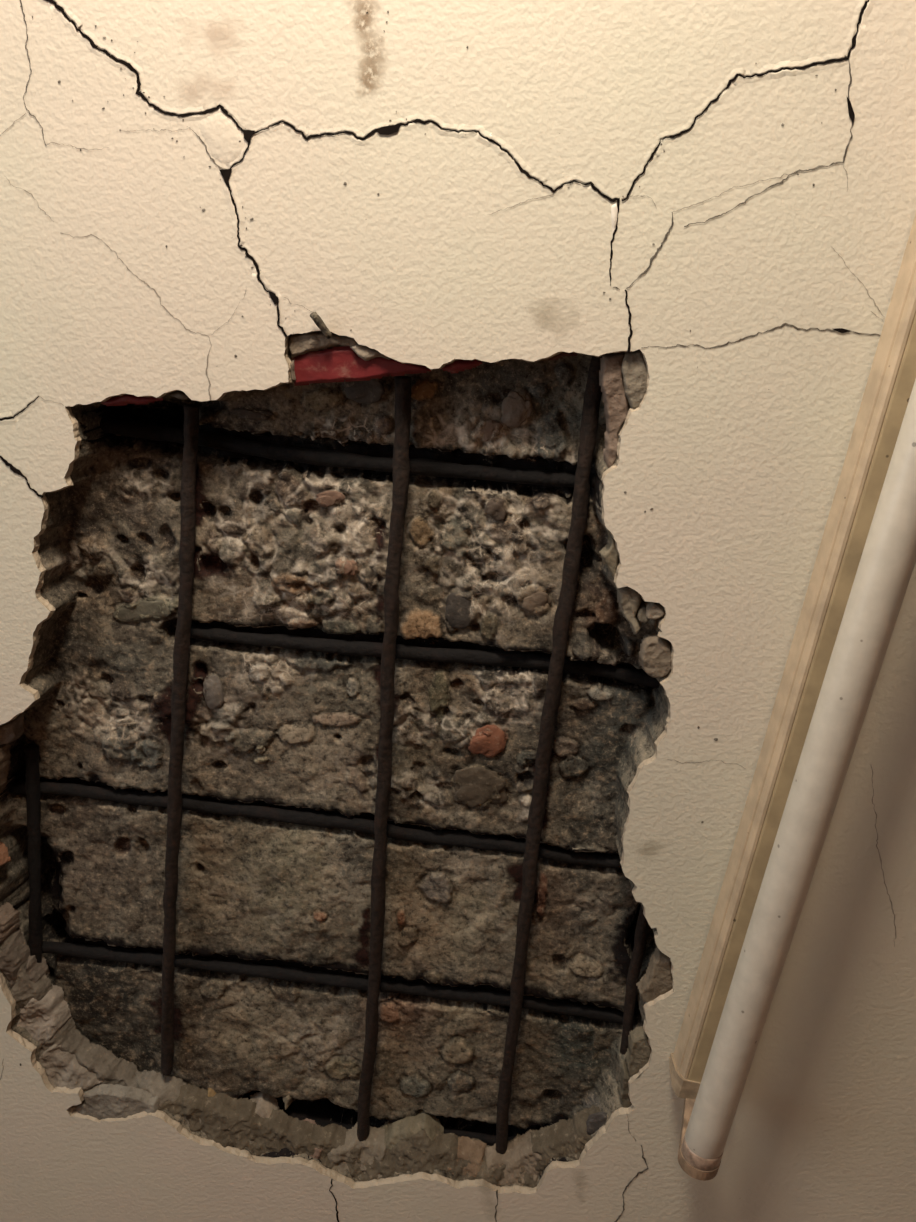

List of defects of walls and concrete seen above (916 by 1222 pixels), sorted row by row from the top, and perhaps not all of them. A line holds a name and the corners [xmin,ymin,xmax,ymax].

crack [4,0,882,400]
crack [0,393,64,426]
crack [0,456,43,498]
spalling [0,331,674,1194]
crack [329,1179,339,1222]
crack [615,1115,648,1222]